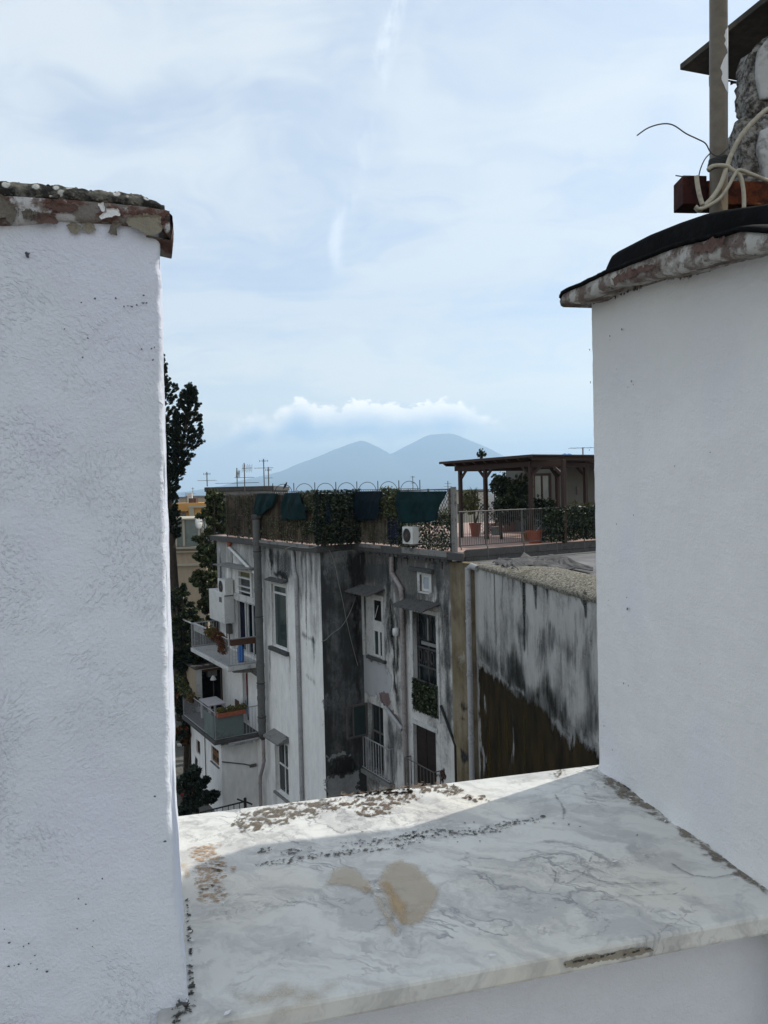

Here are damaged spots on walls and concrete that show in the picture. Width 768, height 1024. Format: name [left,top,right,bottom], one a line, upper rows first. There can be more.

spalling [0,194,163,236]
peeling [694,236,725,255]
leakage [269,548,312,581]
leakage [347,552,408,700]
leakage [481,576,597,747]
spalling [564,947,654,968]